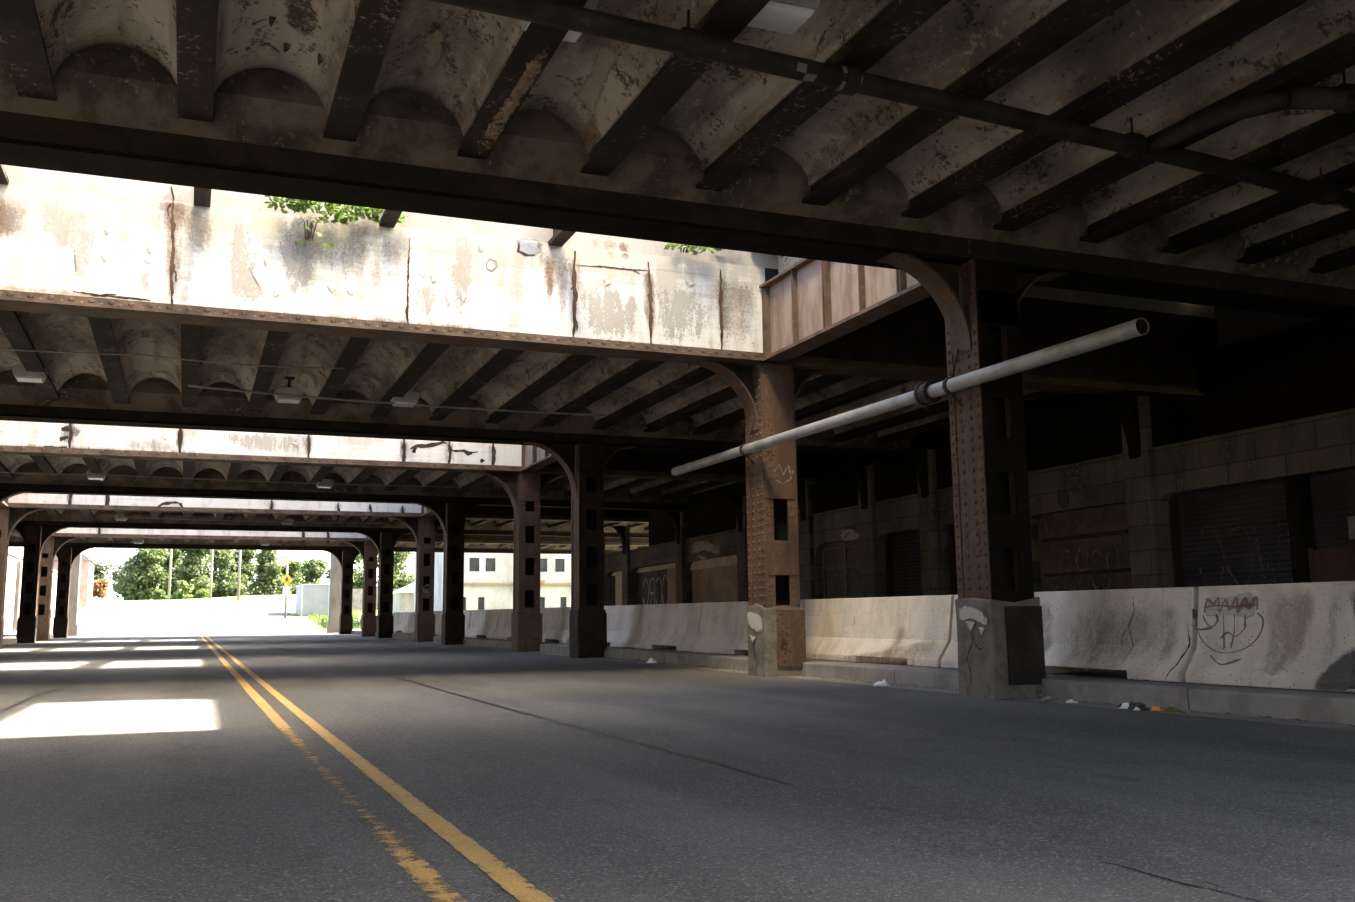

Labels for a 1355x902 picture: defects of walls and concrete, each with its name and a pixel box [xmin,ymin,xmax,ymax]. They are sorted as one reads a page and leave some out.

crack [1087,858,1264,902]